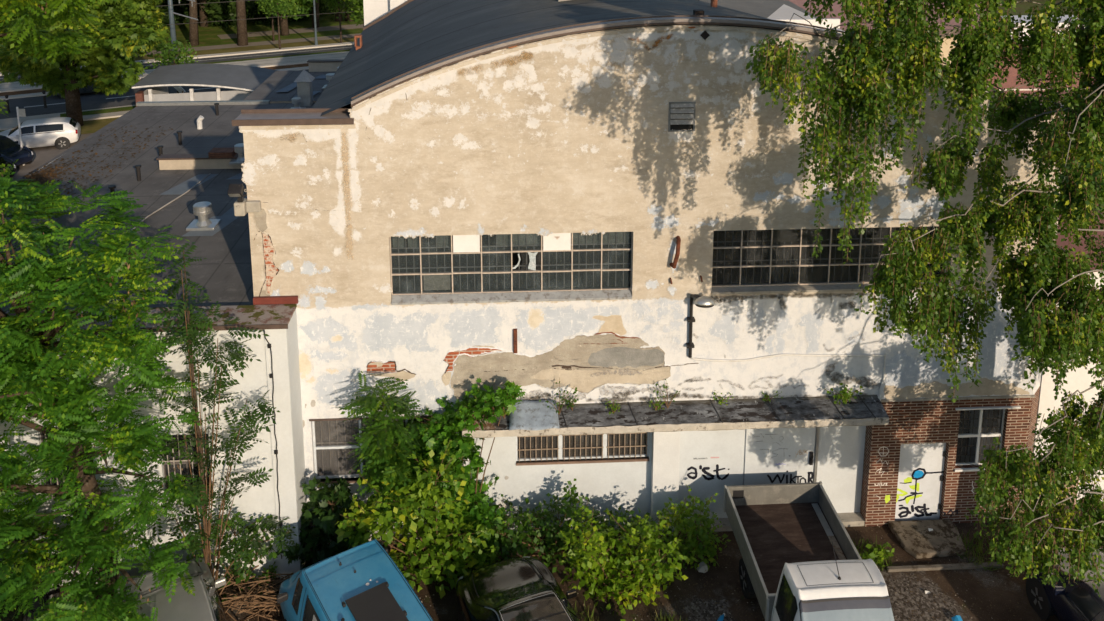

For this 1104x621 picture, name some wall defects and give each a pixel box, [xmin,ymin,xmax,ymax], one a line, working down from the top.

peeling [883,102,904,158]
spalling [238,28,766,427]
peeling [740,133,948,230]
peeling [707,305,824,355]